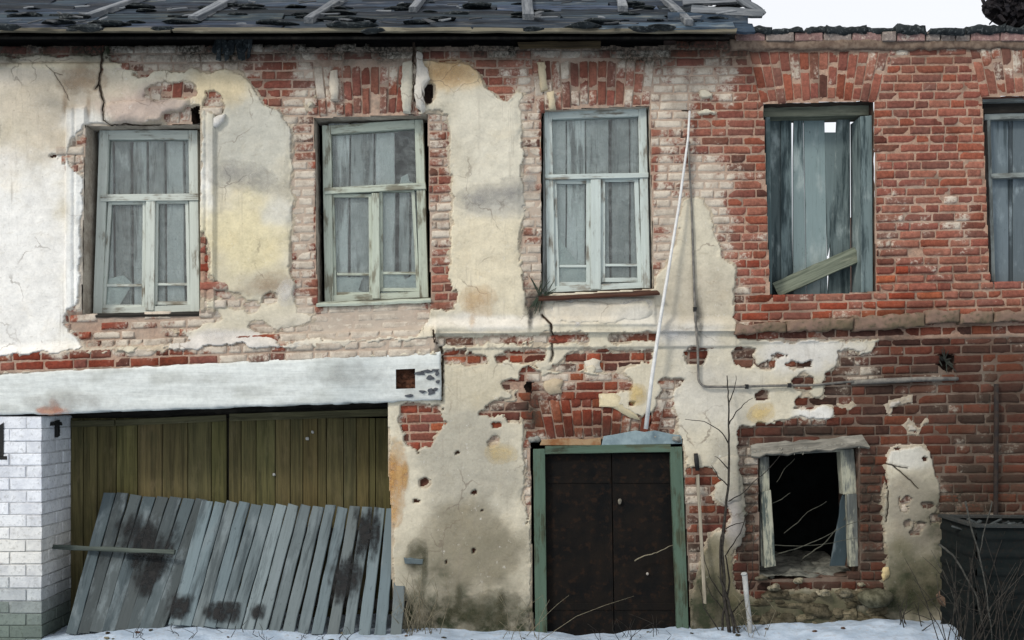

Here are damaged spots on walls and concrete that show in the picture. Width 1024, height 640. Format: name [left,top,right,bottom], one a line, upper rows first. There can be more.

crack [95,47,160,126]
spalling [0,43,684,524]
crack [541,314,556,362]
spalling [684,346,713,365]
spalling [731,346,812,390]
spalling [935,354,954,372]
spalling [755,390,768,400]
water stain [450,590,507,625]